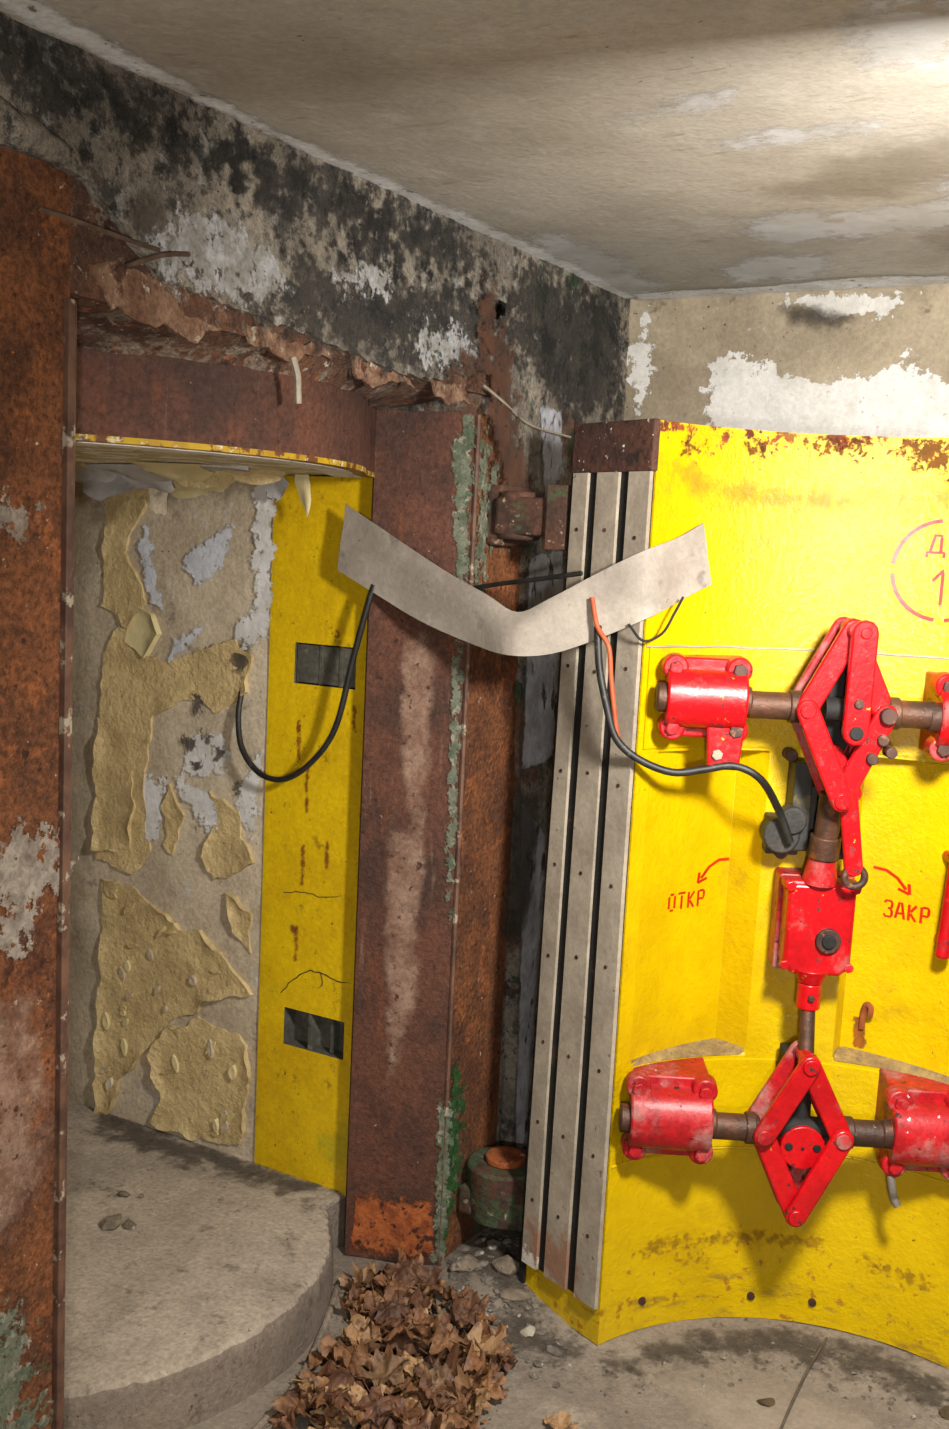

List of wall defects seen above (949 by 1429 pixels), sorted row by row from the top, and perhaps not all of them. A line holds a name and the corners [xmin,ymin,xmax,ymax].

flaking render [37,199,221,344]
damp [0,0,949,498]
flaking render [245,325,333,404]
peeling [697,347,949,438]
corrosion [680,435,708,469]
corrosion [741,437,773,472]
corrosion [798,436,949,482]
damp [528,550,564,610]
damp [522,652,560,771]
peeling [0,462,311,1145]
damp [505,789,547,1149]
corrosion [351,1194,435,1258]